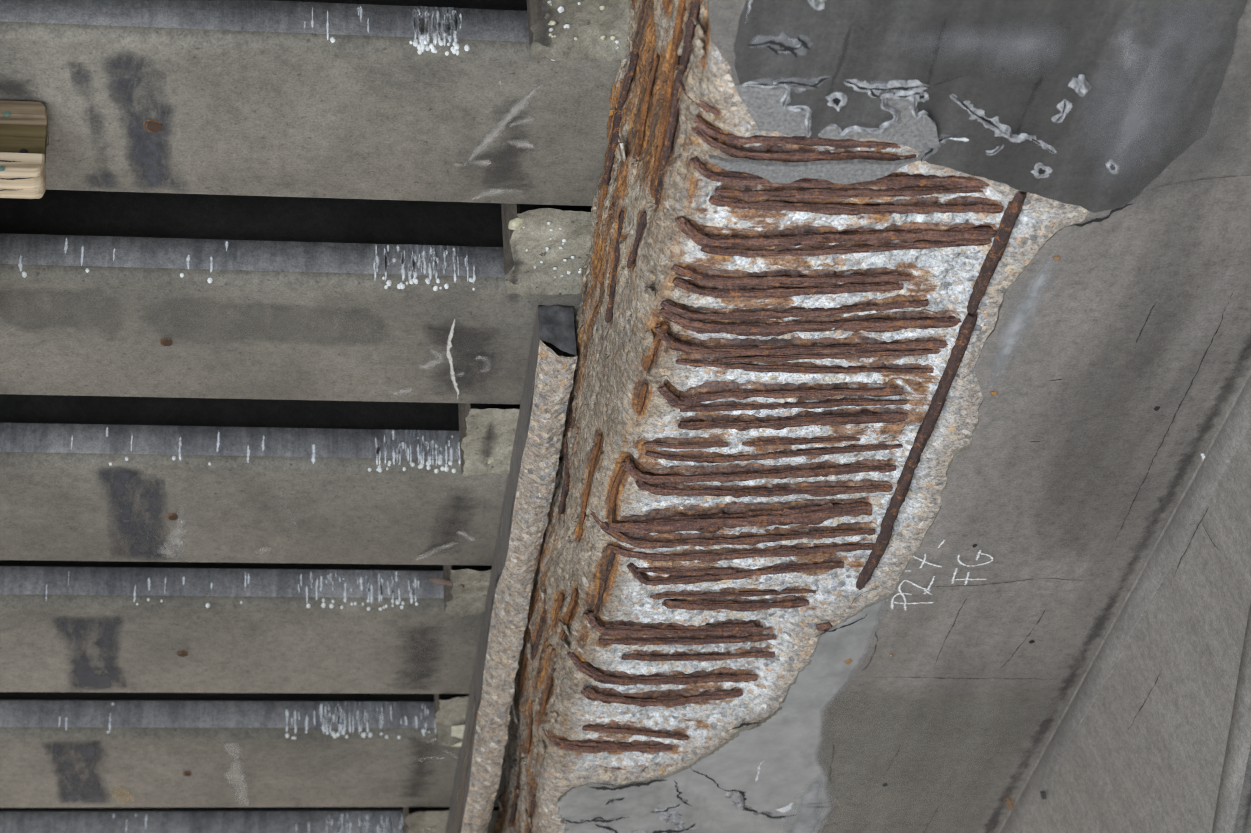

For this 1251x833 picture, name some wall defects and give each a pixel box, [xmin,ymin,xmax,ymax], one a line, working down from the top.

crack [744,32,1072,162]
corrosion [694,116,898,163]
corrosion [738,178,943,216]
corrosion [764,234,902,257]
corrosion [685,275,881,299]
corrosion [661,306,928,374]
corrosion [645,389,884,498]
spalling [494,0,1090,833]
corrosion [582,666,741,708]
crack [560,745,836,833]